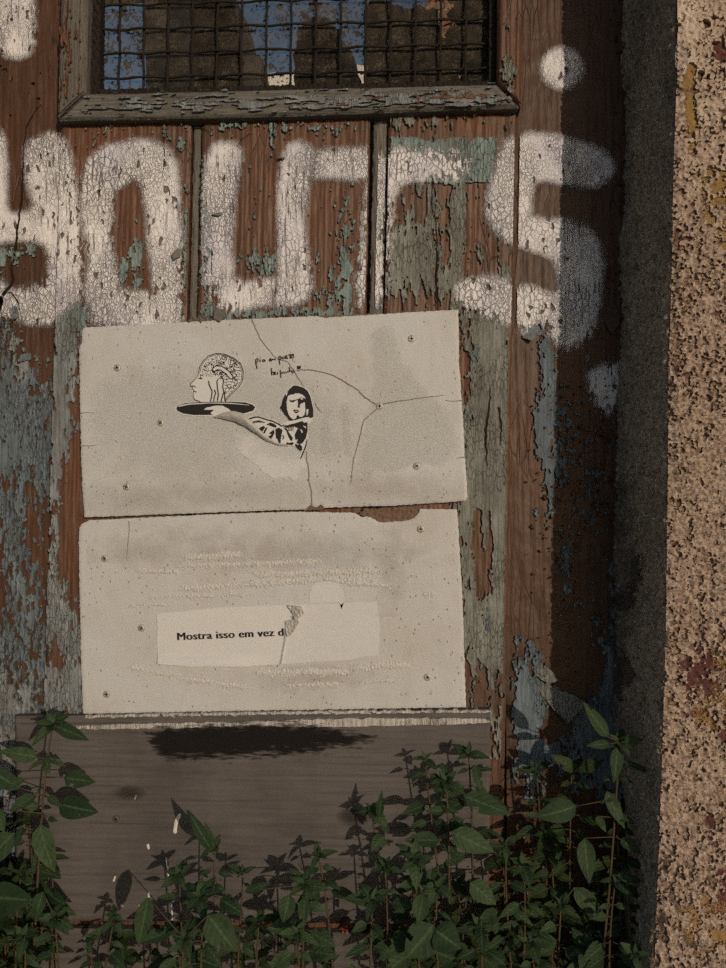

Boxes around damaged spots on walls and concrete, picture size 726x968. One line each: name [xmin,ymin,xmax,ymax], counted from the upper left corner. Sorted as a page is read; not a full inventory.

crack [305,451,313,505]
peeling [0,0,625,854]
crack [251,319,463,485]
peeling [655,0,726,968]